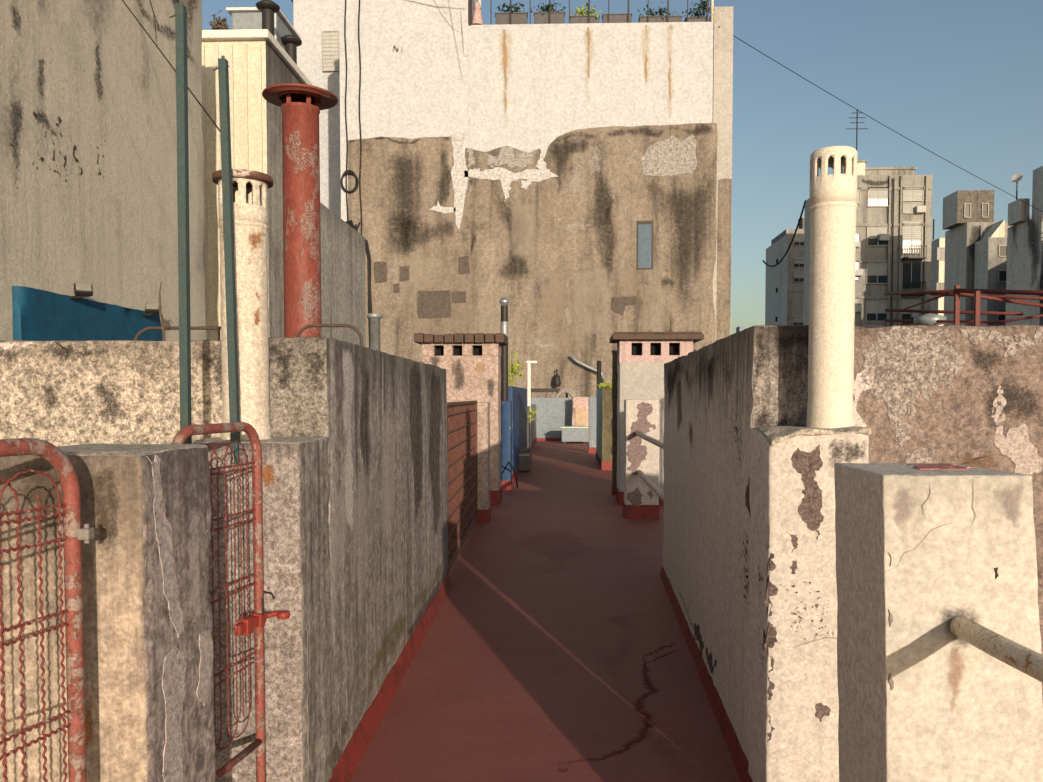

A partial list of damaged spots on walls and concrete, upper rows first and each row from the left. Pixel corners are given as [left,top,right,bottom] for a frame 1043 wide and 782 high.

damp [95,45,103,100]
damp [11,102,83,187]
damp [392,157,433,249]
peeling [467,146,552,202]
damp [553,135,613,275]
damp [662,182,711,291]
damp [667,357,735,441]
peeling [853,325,1043,475]
peeling [626,402,656,506]
peeling [791,445,824,540]
peeling [790,534,799,574]
spalling [763,545,778,700]